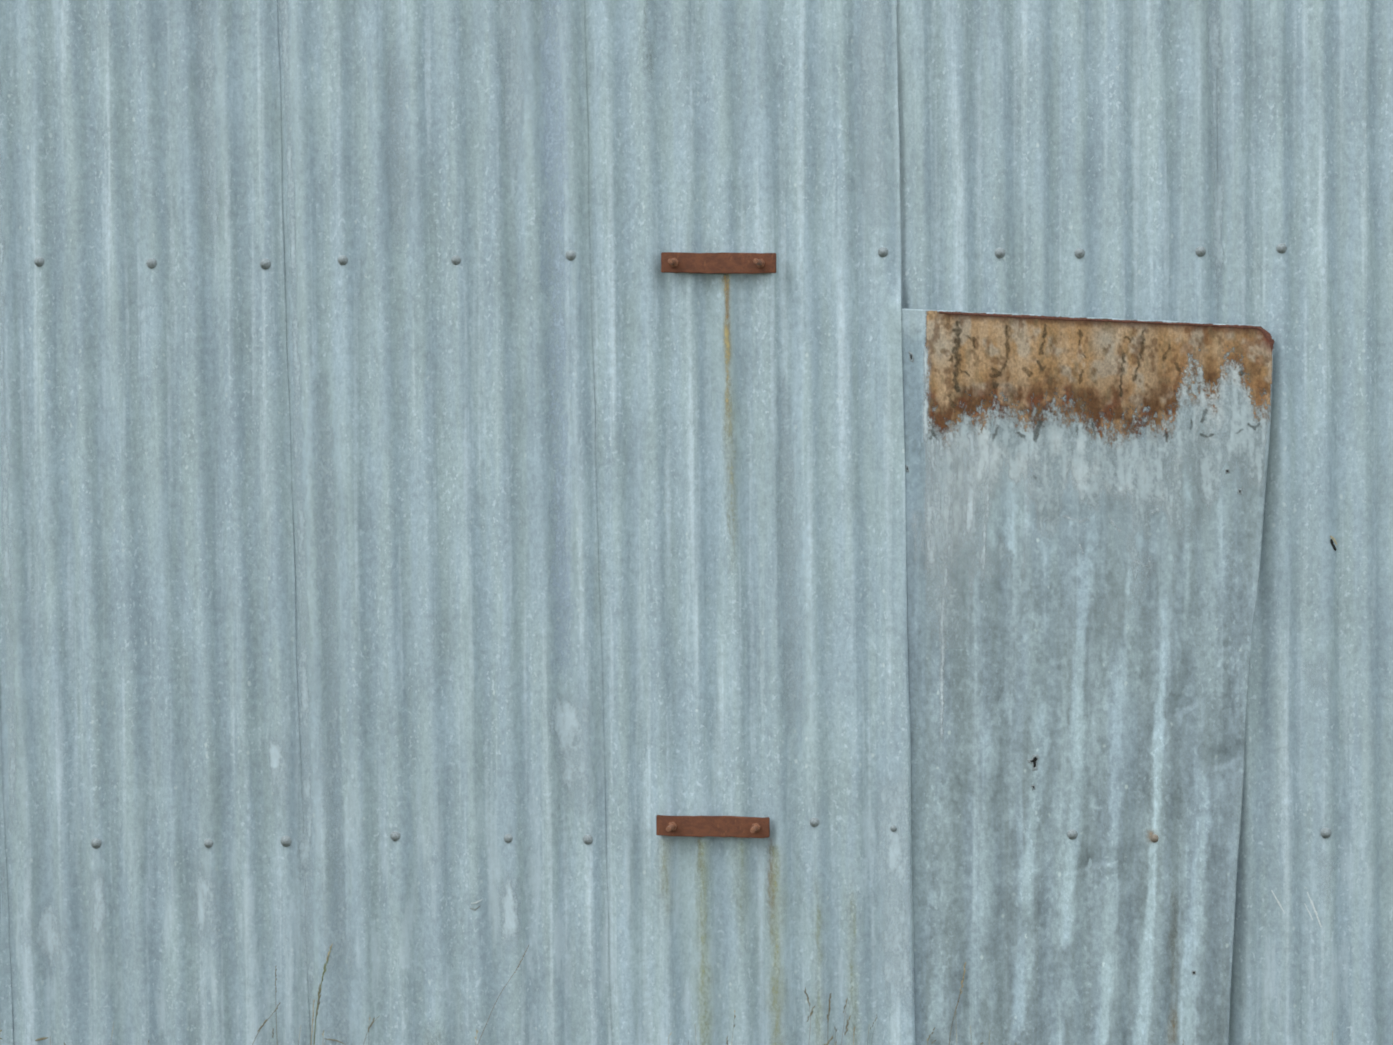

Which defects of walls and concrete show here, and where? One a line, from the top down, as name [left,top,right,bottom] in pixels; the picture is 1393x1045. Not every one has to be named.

rust [925,310,1274,445]